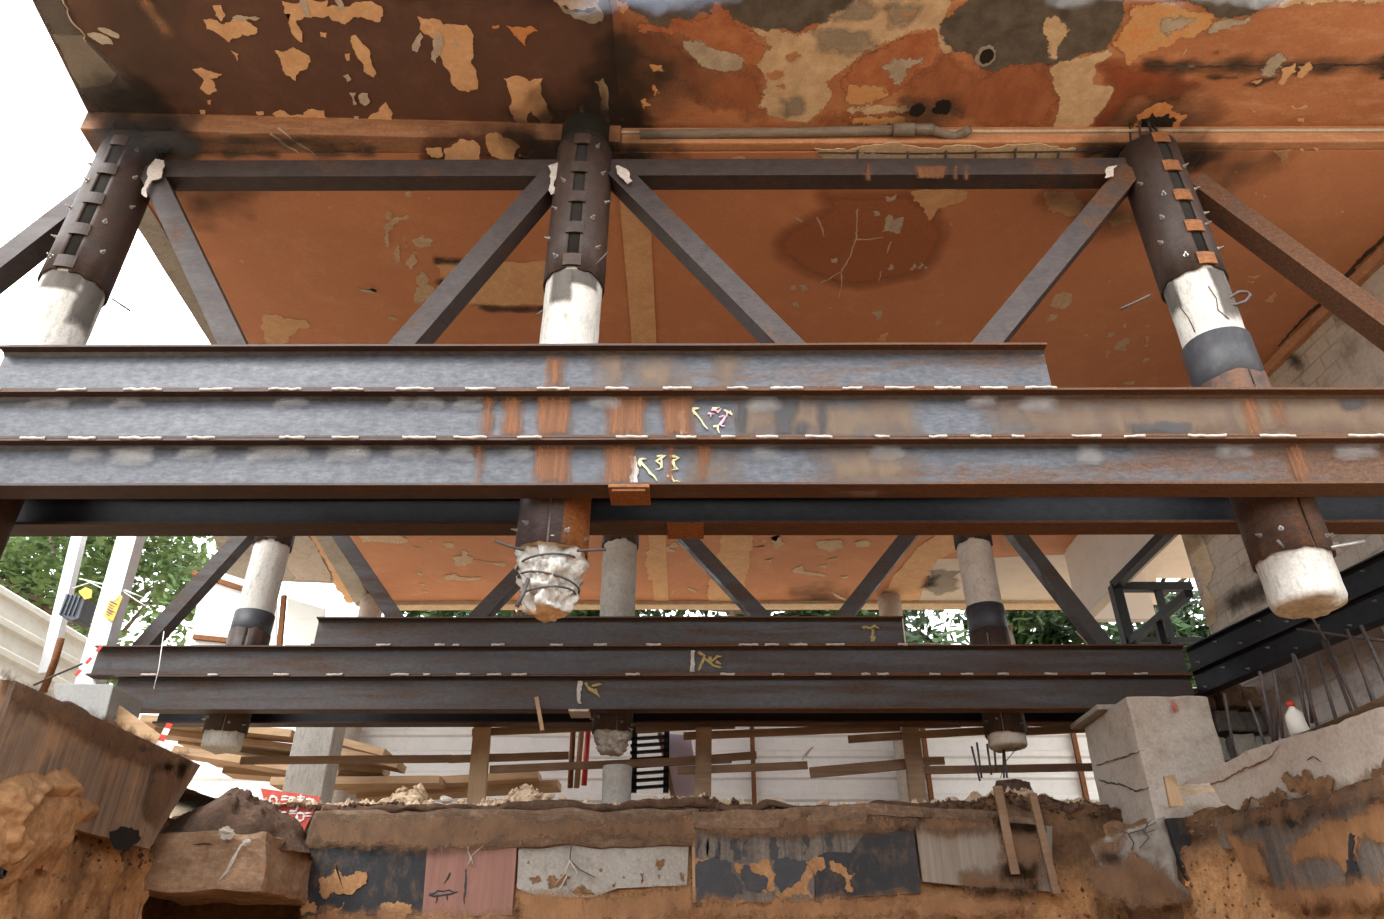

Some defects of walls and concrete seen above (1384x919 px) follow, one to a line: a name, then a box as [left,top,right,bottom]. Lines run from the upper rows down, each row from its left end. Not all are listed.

flaking render [52,27,119,88]
peeling [204,5,259,60]
peeling [275,0,393,120]
peeling [412,17,478,92]
spalling [554,0,1384,127]
crack [817,209,891,299]
damp [779,194,943,286]
rust [473,357,572,483]
rust [602,356,716,482]
rust [745,398,912,435]
rust [831,450,906,482]
crack [1096,750,1149,792]